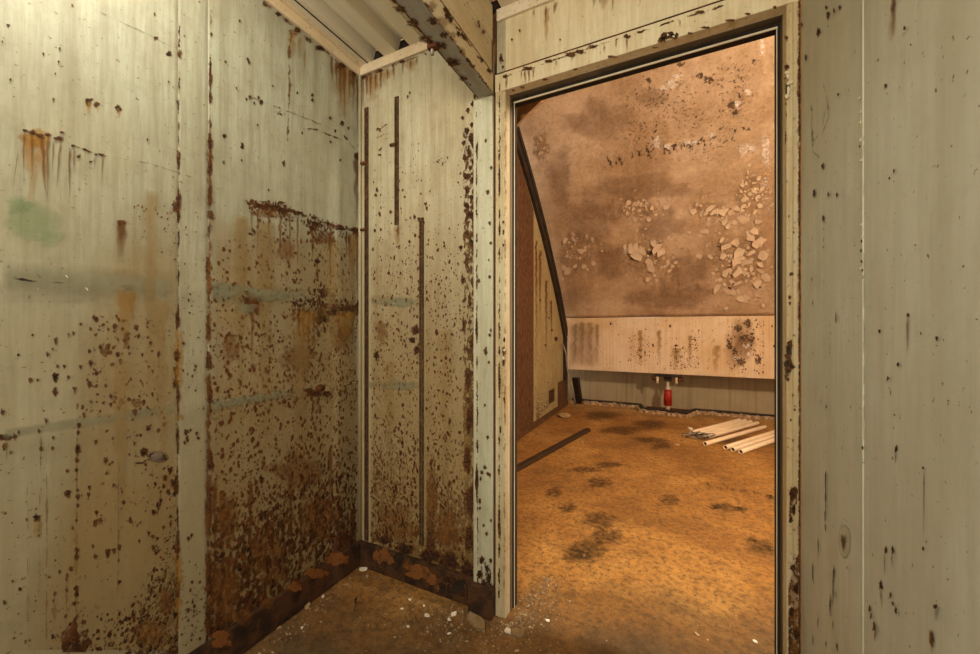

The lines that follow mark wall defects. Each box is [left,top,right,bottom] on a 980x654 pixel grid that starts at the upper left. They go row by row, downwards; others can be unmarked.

water stain [624,62,733,160]
water stain [696,41,764,128]
rust [16,119,359,654]
rust [263,0,618,600]
peeling [623,235,679,282]
rust [600,320,728,370]
peeling [688,145,773,374]
rust [784,0,807,654]
rust [0,430,20,455]